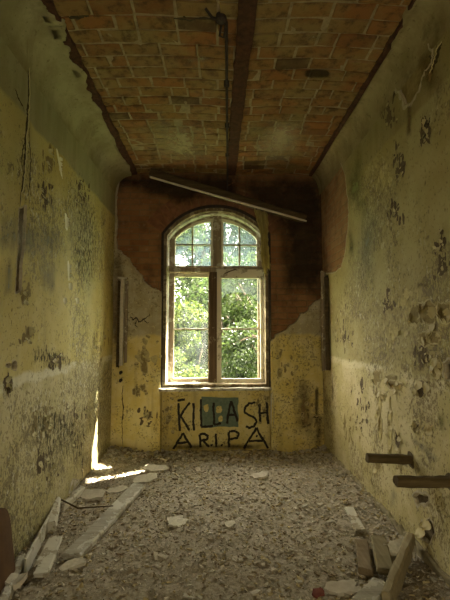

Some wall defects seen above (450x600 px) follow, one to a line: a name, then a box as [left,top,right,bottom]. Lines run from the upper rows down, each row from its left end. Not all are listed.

crack [429,41,442,73]
crack [15,68,32,206]
flaking render [115,173,256,293]
flaking render [170,164,349,341]
peeling [3,360,17,398]
peeling [48,353,65,371]
peeling [343,369,405,454]
peeling [380,287,450,399]
flaking render [415,517,436,546]
flaking render [412,488,445,511]